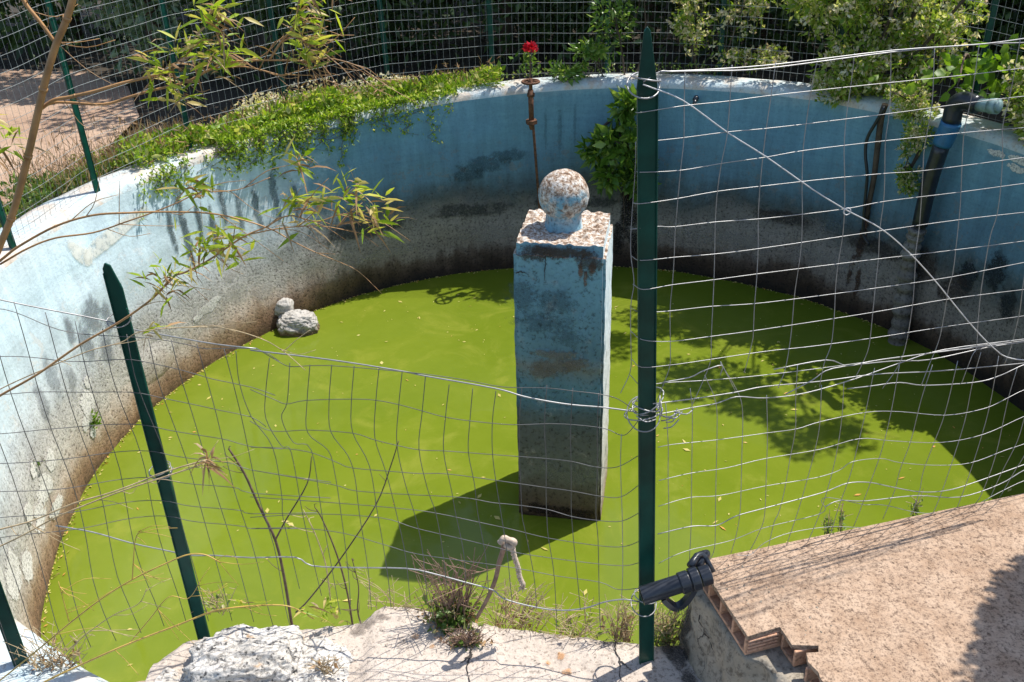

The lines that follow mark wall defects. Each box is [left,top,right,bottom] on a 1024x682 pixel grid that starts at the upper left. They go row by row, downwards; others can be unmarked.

water stain [440,204,505,218]
water stain [757,209,807,226]
water stain [331,220,402,241]
water stain [849,237,900,259]
water stain [915,251,1017,321]